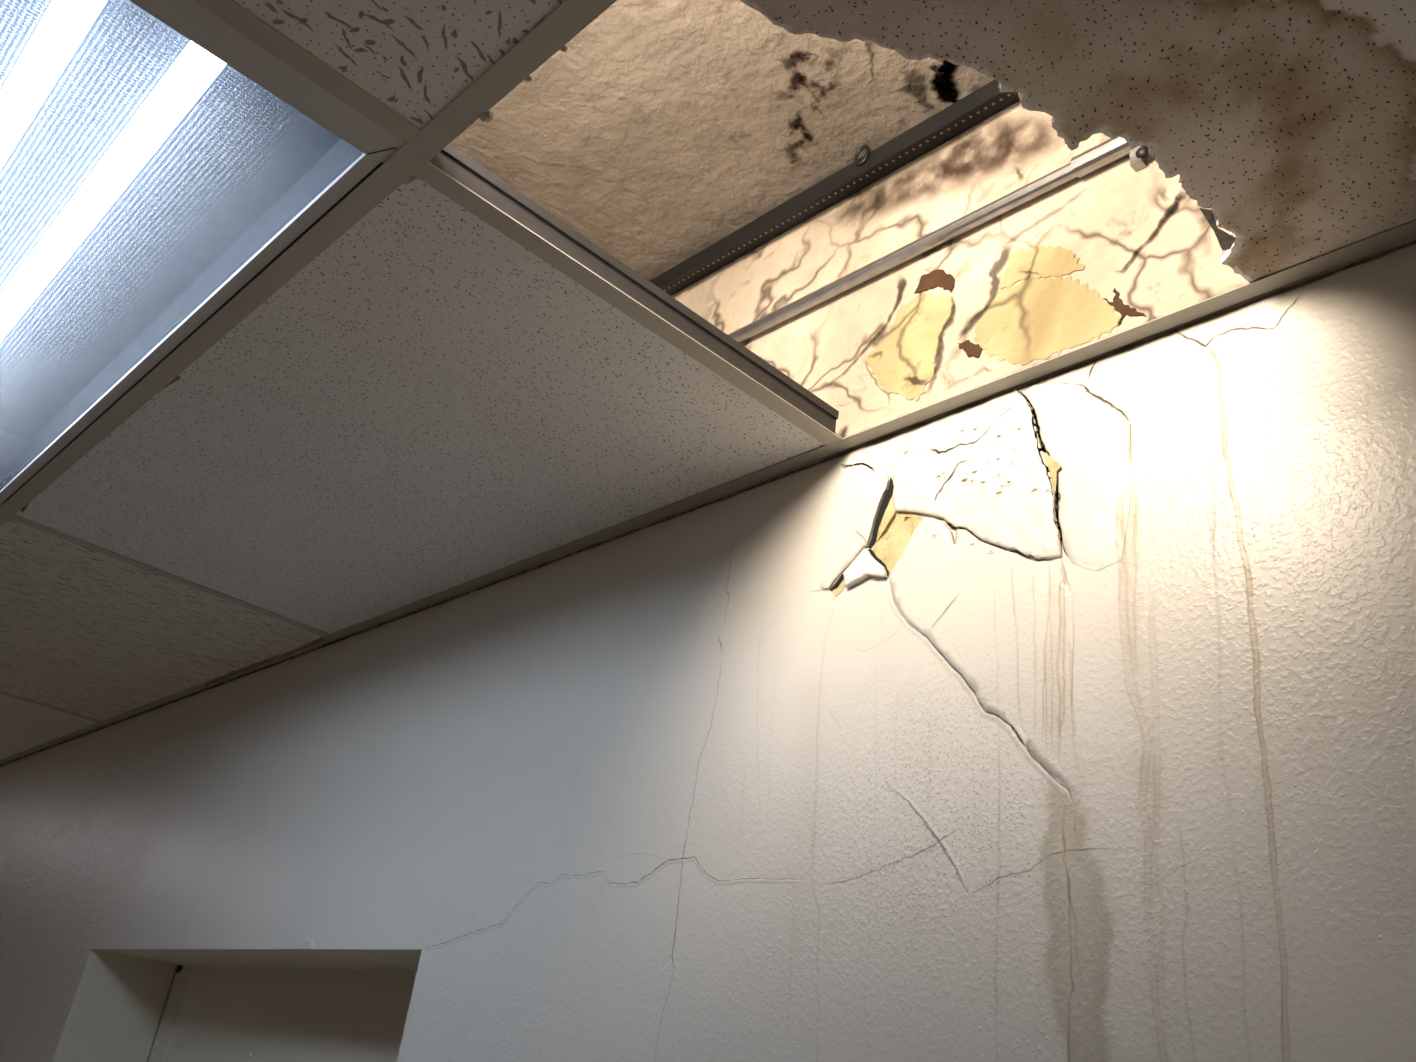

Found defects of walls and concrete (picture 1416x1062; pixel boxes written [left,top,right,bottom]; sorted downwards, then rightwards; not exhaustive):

peeling [787,52,836,163]
flaking render [867,245,1145,401]
crack [842,463,874,471]
flaking render [809,465,925,597]
crack [933,363,1127,561]
crack [887,580,1074,806]
crack [886,782,968,893]
crack [423,857,802,952]